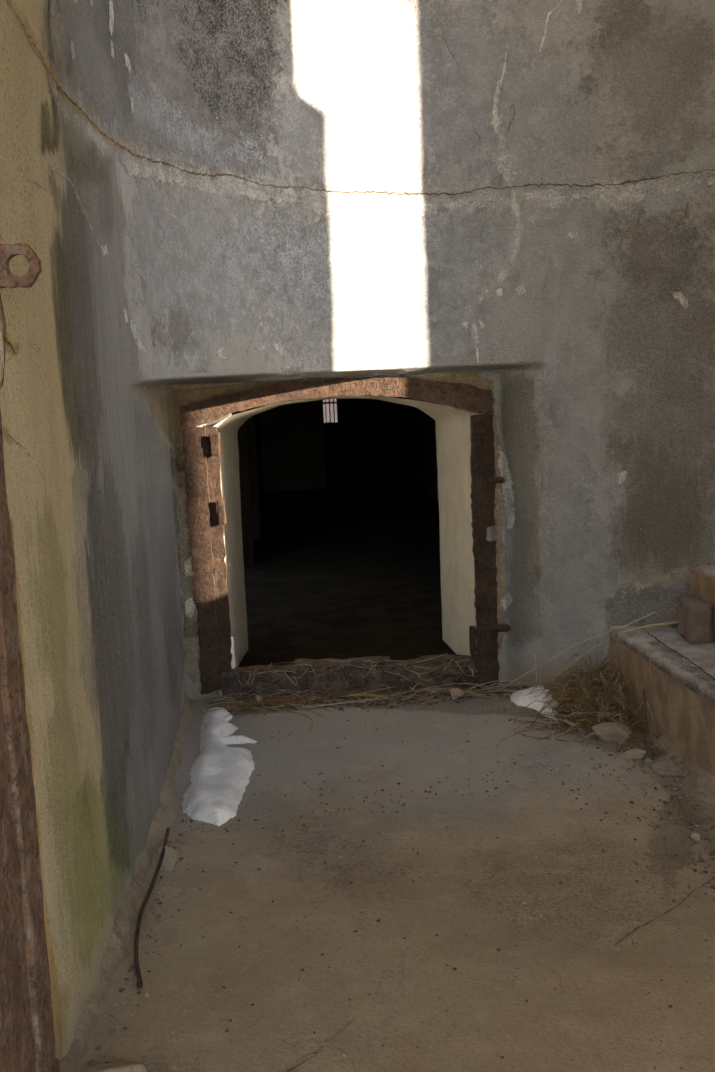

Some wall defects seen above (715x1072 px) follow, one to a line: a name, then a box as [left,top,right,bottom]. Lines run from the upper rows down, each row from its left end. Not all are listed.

peeling [109,0,131,73]
crack [9,0,715,220]
peeling [673,291,689,309]
damp [42,0,591,872]
rust [16,580,62,1060]